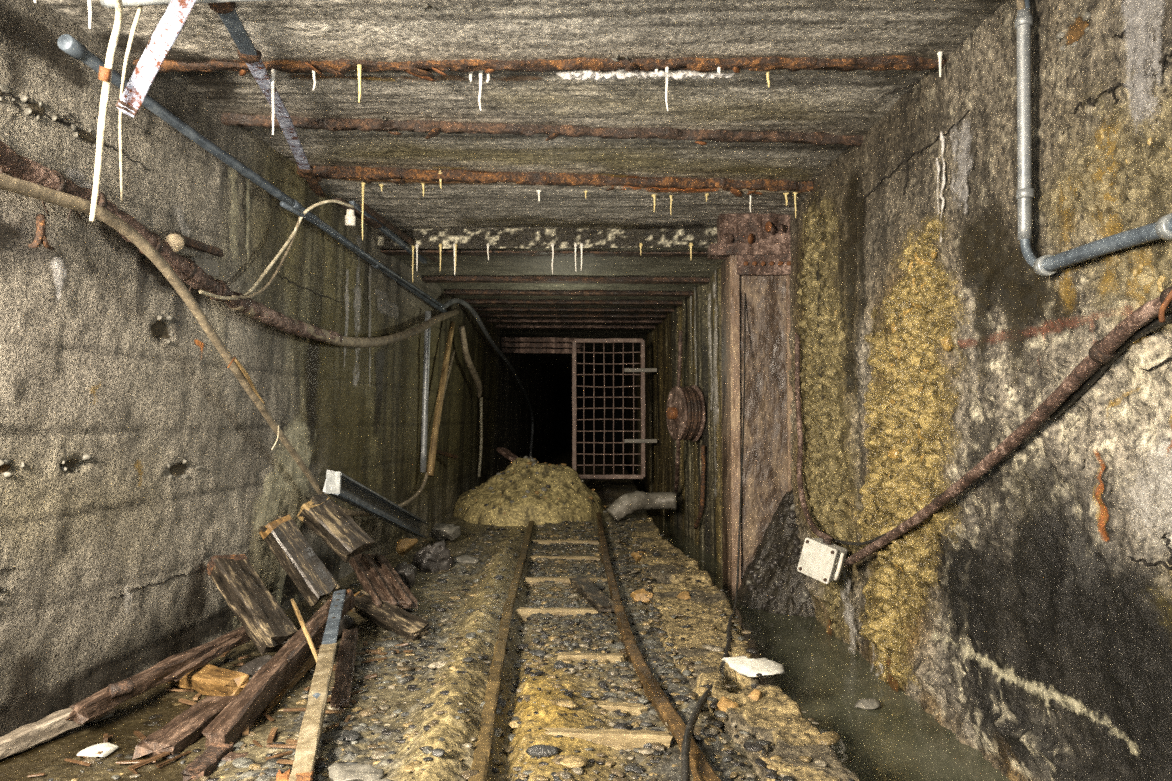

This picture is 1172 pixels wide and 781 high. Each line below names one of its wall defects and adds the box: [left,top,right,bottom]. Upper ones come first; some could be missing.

rust [291,62,540,82]
rust [624,62,641,74]
damp [1121,0,1164,136]
rust [348,167,487,185]
rust [599,174,763,197]
crack [1141,357,1172,372]
rust [1093,449,1109,542]
damp [1128,438,1172,542]
crack [1128,533,1172,570]
damp [935,521,1172,781]